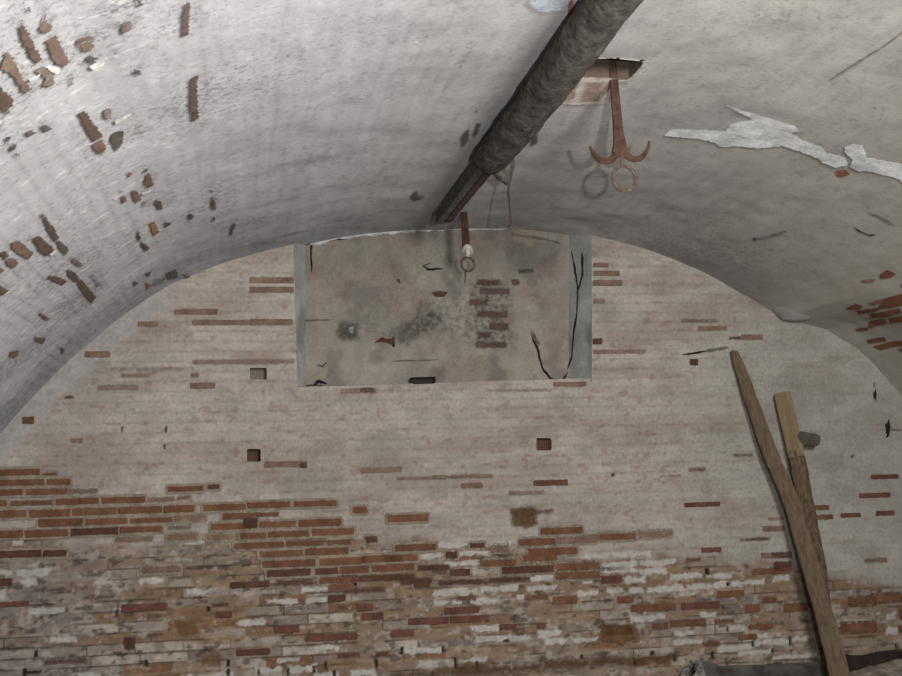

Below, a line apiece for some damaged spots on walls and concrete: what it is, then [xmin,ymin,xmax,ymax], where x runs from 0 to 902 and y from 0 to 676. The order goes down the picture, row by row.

spalling [0,15,70,113]
crack [832,32,902,79]
spalling [189,75,200,121]
spalling [78,108,132,155]
spalling [119,169,163,210]
spalling [0,214,101,303]
crack [306,228,584,379]
spalling [846,270,902,352]
peeling [0,466,674,602]
peeling [391,596,489,637]
peeling [617,590,808,630]
leakage [390,655,674,676]